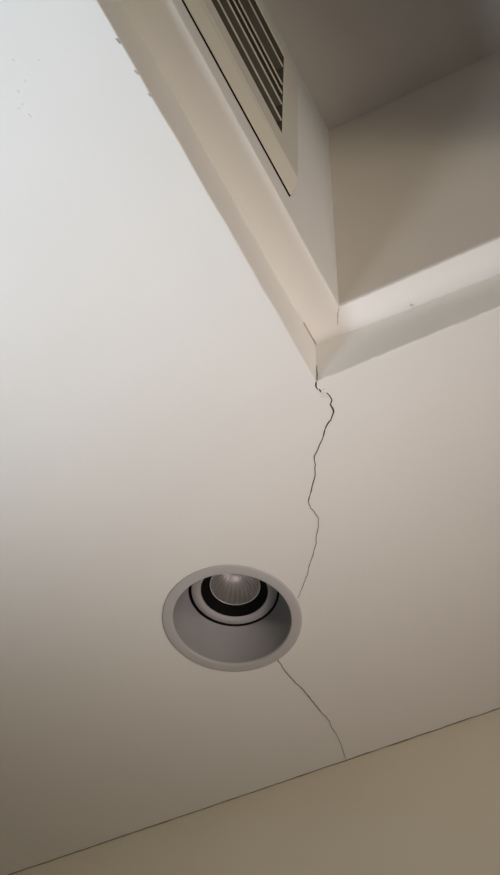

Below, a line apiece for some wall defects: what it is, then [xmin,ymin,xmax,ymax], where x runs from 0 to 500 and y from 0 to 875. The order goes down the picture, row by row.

crack [298,369,335,597]